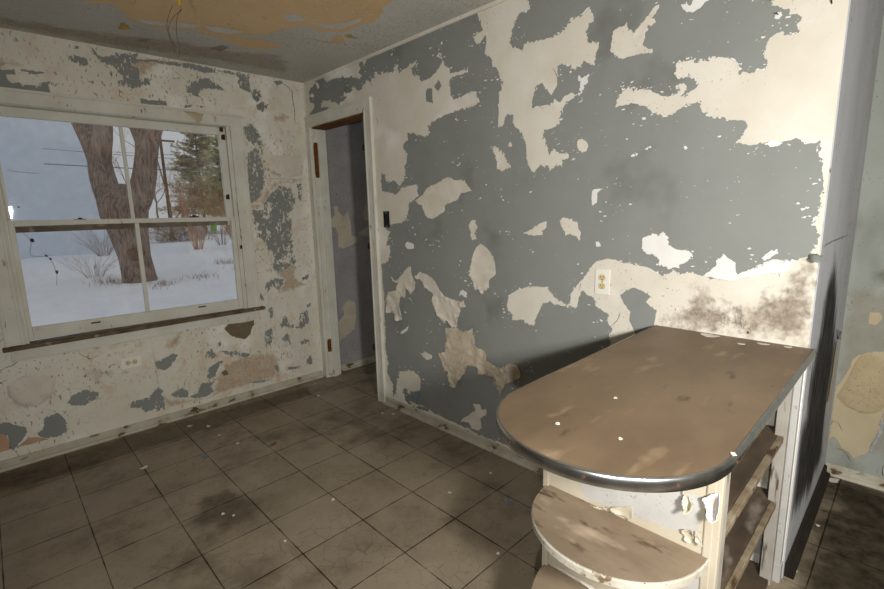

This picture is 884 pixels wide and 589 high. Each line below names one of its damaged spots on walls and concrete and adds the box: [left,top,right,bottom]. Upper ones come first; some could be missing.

peeling [80,0,392,51]
peeling [0,69,50,92]
peeling [69,45,268,123]
peeling [243,124,311,347]
peeling [309,0,827,446]
damp [755,283,807,330]
peeling [0,413,69,452]
peeling [66,389,99,406]
peeling [128,320,254,412]
damp [792,272,837,514]
peeling [827,330,884,458]
peeling [579,482,720,547]